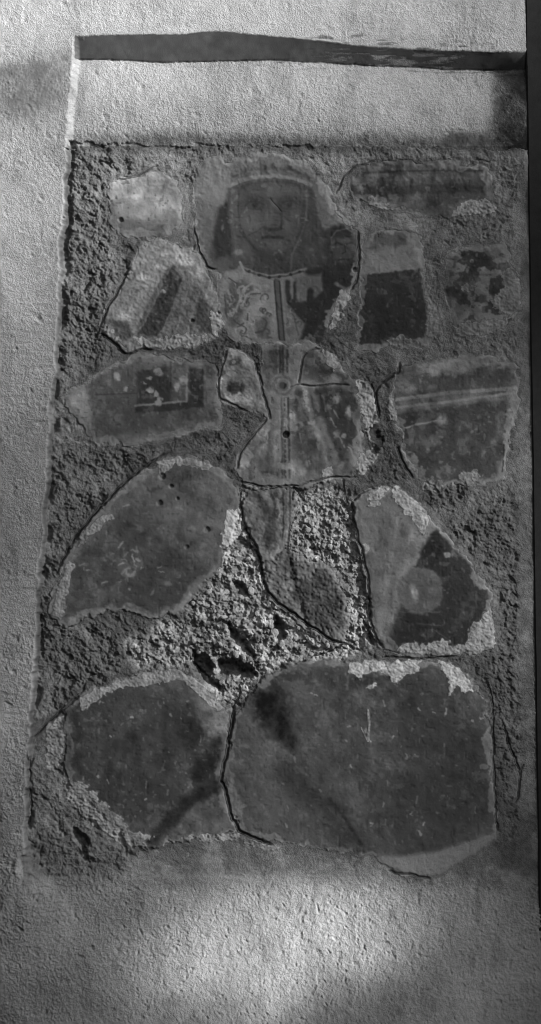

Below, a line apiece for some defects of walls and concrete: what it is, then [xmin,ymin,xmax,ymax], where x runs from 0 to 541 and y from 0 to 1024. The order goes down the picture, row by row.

peeling [329,289,351,330]
peeling [321,349,341,372]
peeling [156,455,213,477]
crack [218,355,456,662]
peeling [356,376,398,475]
peeling [51,561,76,620]
spalling [77,466,497,711]
crack [219,684,273,846]